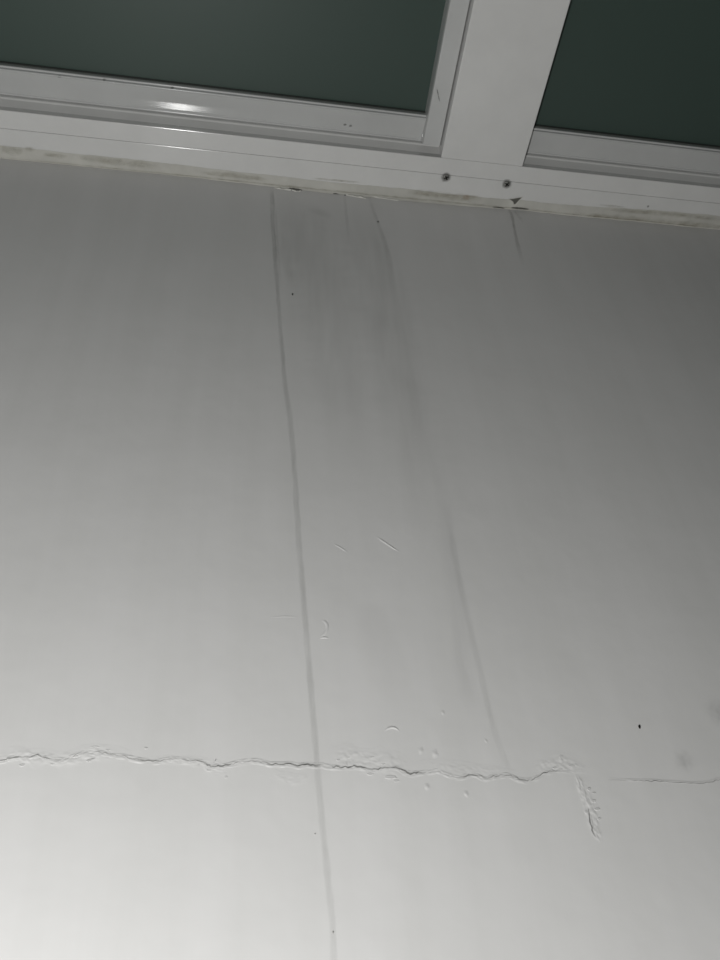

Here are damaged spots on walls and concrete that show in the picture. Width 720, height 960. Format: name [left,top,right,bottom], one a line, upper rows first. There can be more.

crack [0,746,574,785]
crack [606,776,720,784]